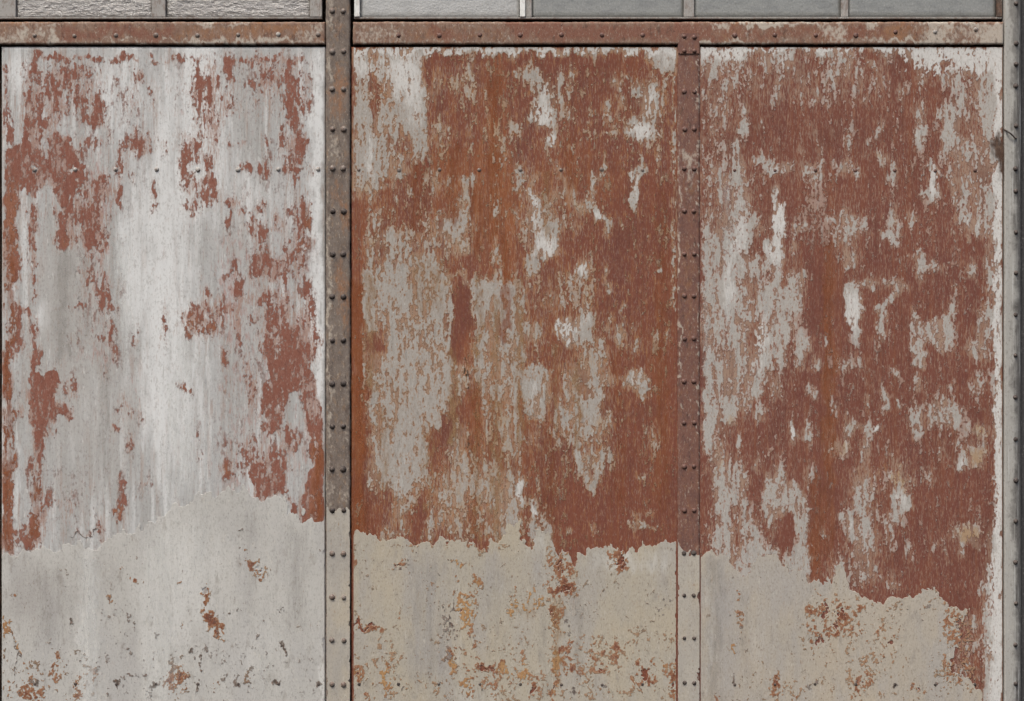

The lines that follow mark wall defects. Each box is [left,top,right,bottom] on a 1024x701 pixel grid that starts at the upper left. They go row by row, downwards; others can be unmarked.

corrosion [990,133,1004,172]
peeling [701,47,1002,701]
corrosion [200,583,225,642]
spalling [442,599,475,660]
corrosion [354,544,676,701]
corrosion [733,589,982,701]
spalling [106,673,161,697]